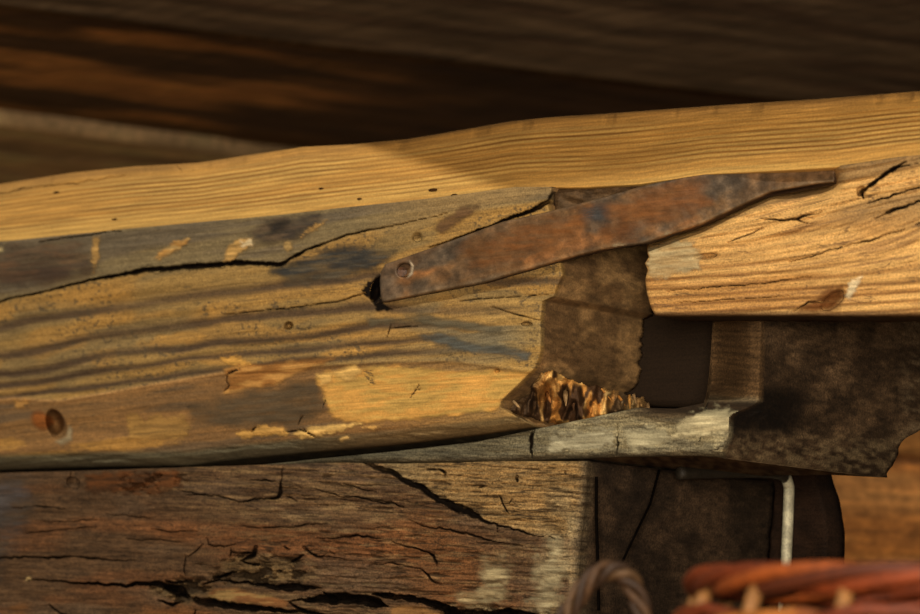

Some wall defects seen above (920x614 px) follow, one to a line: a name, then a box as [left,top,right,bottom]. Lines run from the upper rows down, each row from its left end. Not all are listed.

crack [0,180,89,194]
crack [438,195,552,245]
crack [734,214,812,240]
crack [803,162,920,259]
crack [0,227,384,302]
crack [267,294,361,310]
crack [679,280,780,302]
crack [527,431,535,456]
crack [0,464,535,614]
crack [593,477,601,564]
crack [622,469,660,562]
crack [594,587,602,611]